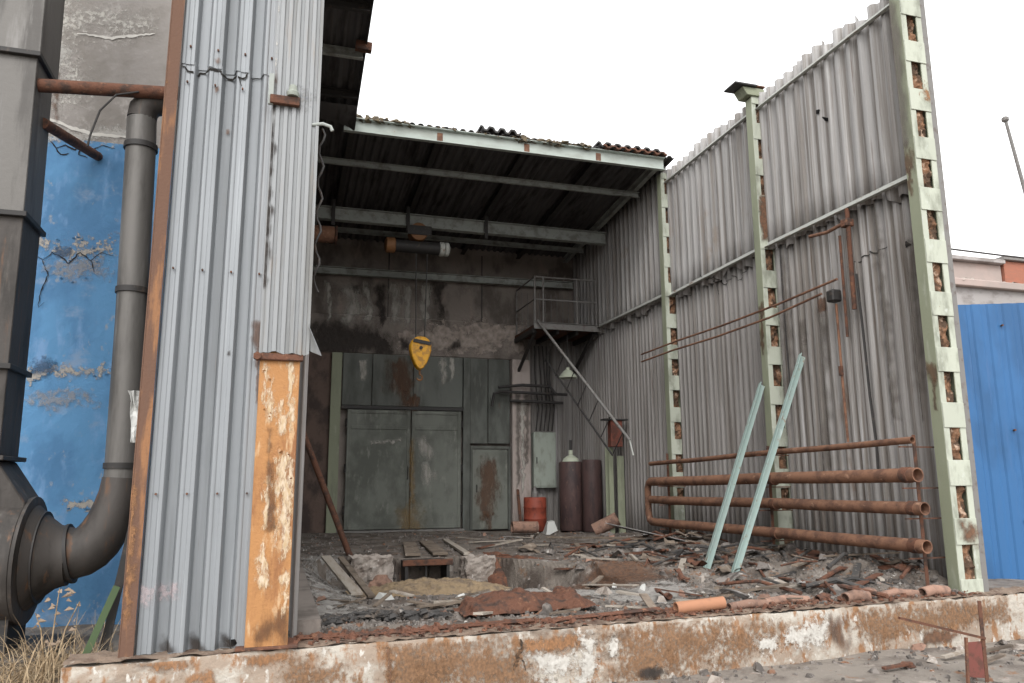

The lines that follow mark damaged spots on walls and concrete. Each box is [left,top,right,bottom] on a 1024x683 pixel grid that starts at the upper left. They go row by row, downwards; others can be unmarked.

crack [38,252,113,308]
peeling [39,233,116,284]
leakage [310,281,445,379]
peeling [27,356,111,411]
peeling [261,362,295,435]
rust [477,460,497,529]
rust [123,485,137,620]
peeling [255,450,294,614]
rust [380,634,581,683]
rust [598,618,784,683]
rust [830,597,1011,650]